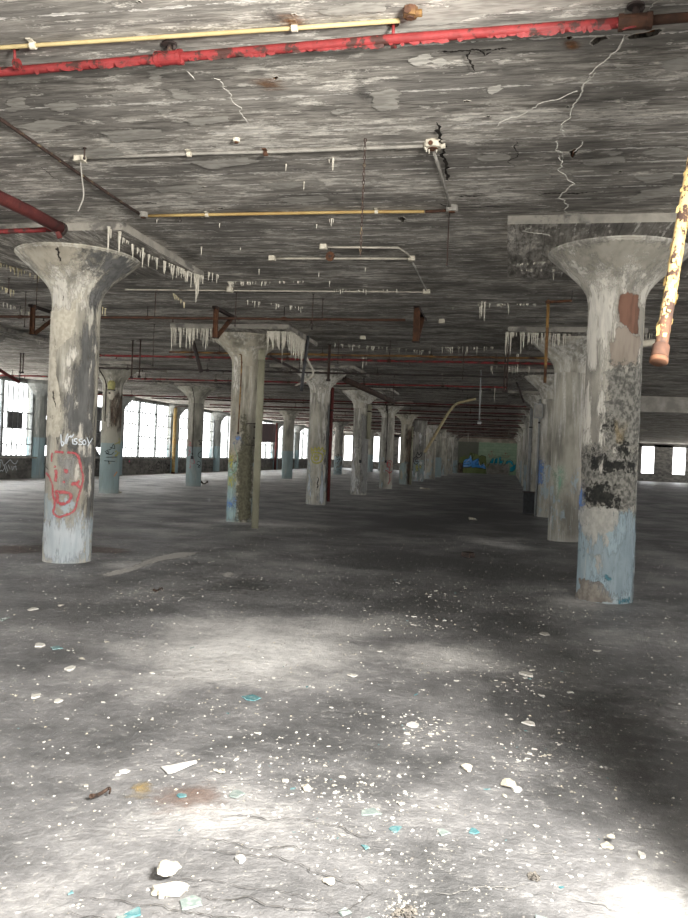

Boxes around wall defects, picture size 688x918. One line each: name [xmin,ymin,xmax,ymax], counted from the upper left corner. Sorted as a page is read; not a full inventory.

peeling [317,2,387,16]
crack [437,47,507,71]
peeling [330,89,402,115]
crack [499,35,625,213]
crack [434,122,510,208]
peeling [610,292,642,367]
peeling [575,506,619,603]
crack [231,814,367,837]
crack [72,837,373,918]